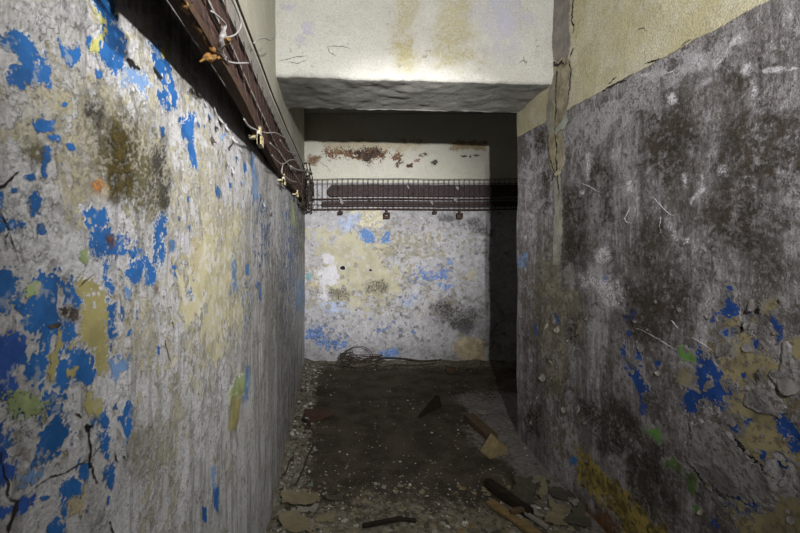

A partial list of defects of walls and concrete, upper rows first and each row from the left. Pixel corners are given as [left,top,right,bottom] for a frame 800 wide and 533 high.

peeling [0,21,55,92]
damp [83,101,173,215]
peeling [57,0,200,172]
crack [548,0,574,202]
damp [645,92,698,186]
damp [638,34,742,80]
damp [703,114,800,254]
peeling [0,101,272,533]
peeling [294,207,457,356]
damp [580,247,701,341]
crack [1,413,126,533]
spalling [601,283,800,533]